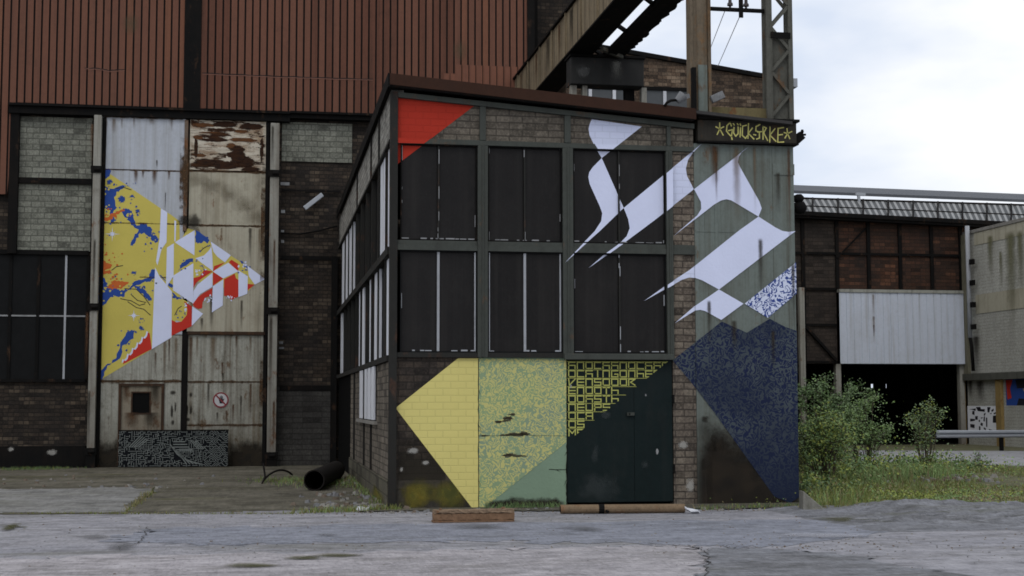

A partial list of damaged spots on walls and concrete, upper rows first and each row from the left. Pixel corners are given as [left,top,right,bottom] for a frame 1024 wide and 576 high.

peeling [190,120,265,172]
spalling [481,413,531,437]
water stain [687,435,799,504]